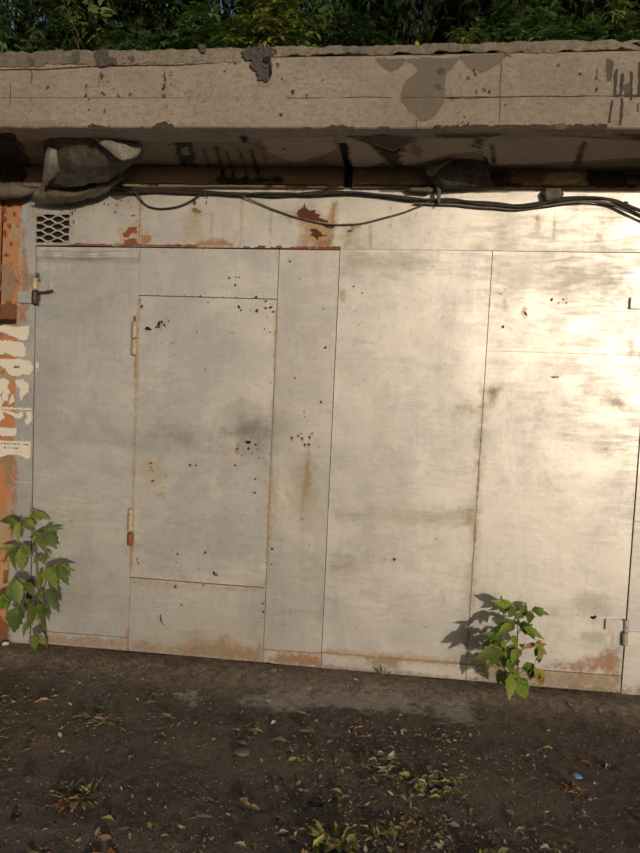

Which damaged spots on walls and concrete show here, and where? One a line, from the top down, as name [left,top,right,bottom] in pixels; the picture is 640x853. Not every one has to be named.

damp [595,59,640,125]
damp [586,170,640,188]
corrosion [71,227,232,248]
corrosion [243,203,341,249]